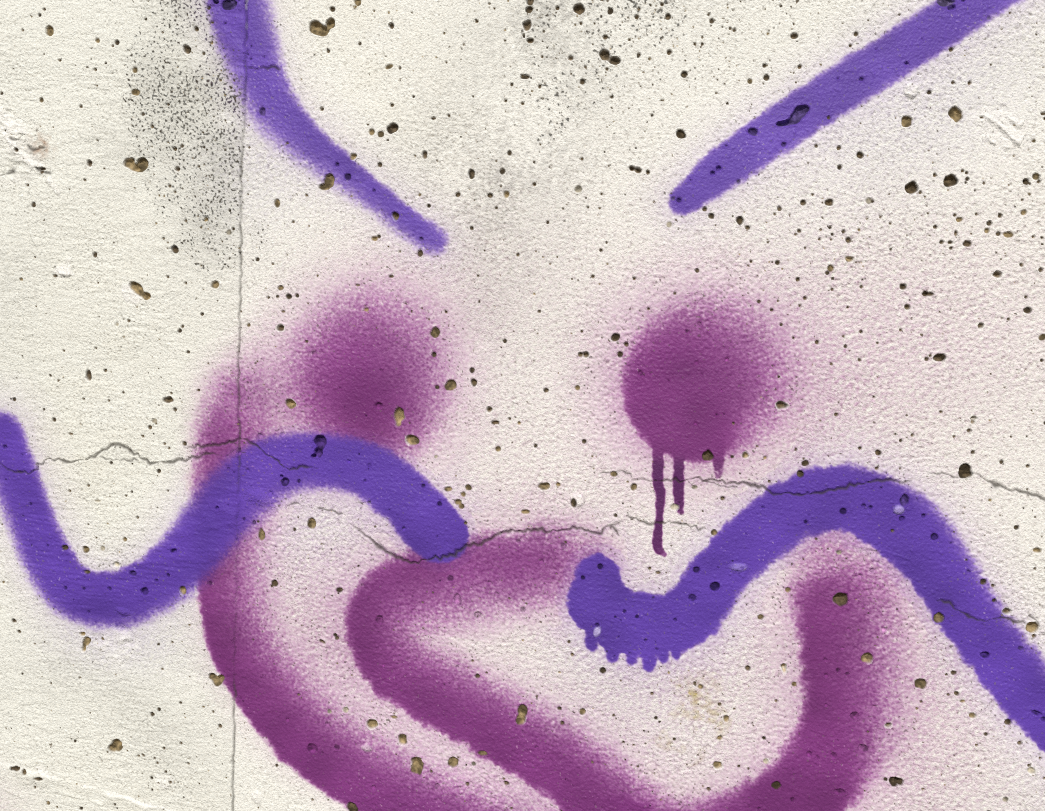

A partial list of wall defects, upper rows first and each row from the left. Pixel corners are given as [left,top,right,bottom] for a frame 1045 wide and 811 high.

crack [0,437,319,476]
crack [598,469,1045,502]
crack [284,501,706,566]
crack [936,598,1045,637]